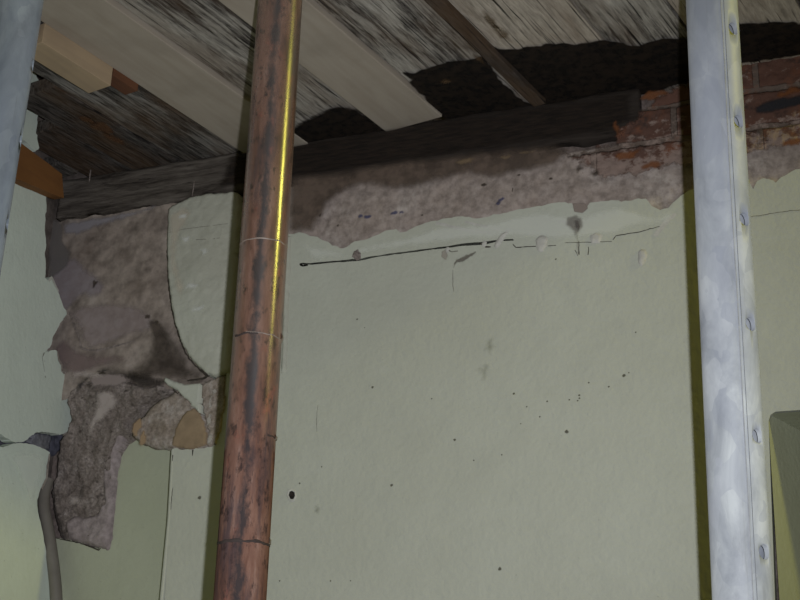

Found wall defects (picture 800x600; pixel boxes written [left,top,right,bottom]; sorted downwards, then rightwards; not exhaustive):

water stain [739,22,800,63]
water stain [223,156,246,185]
water stain [291,39,689,231]
spalling [288,82,694,260]
flaking render [742,56,800,188]
crack [299,226,660,267]
spalling [0,203,226,550]